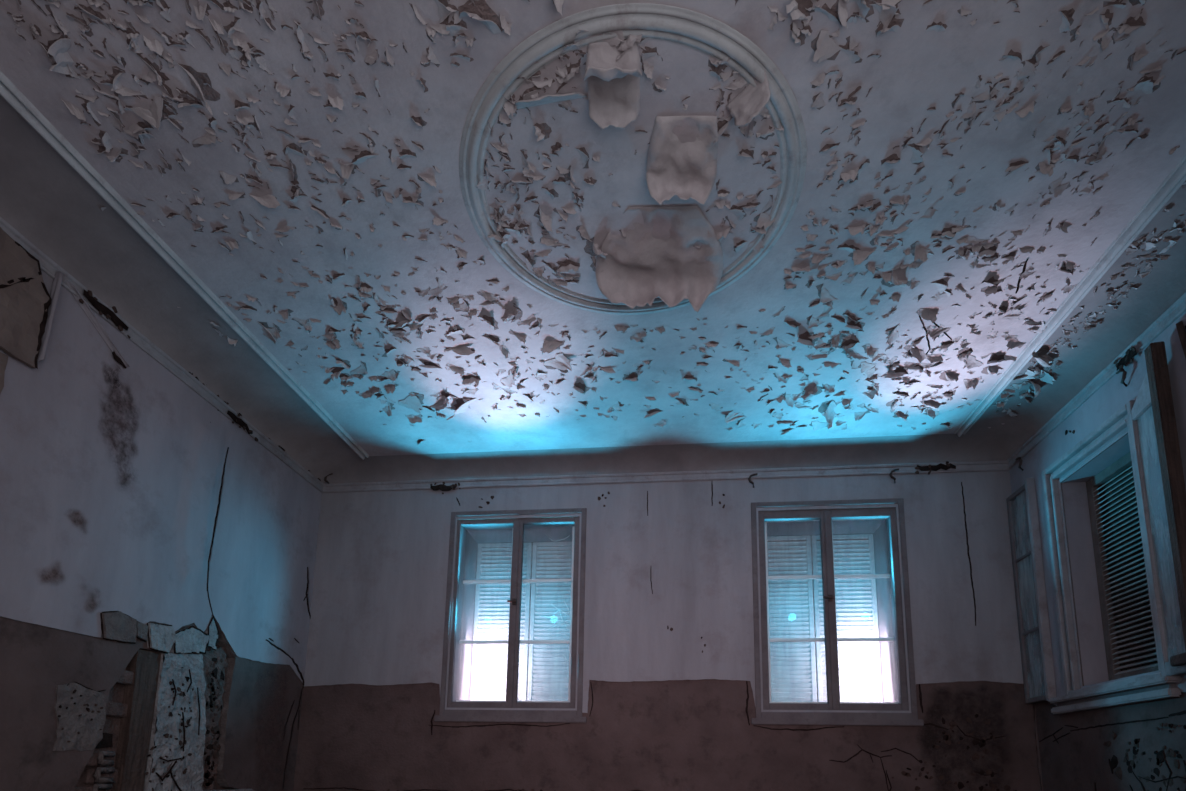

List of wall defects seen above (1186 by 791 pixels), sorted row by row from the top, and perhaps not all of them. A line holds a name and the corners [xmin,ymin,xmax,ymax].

peeling [0,0,1186,435]
damp [103,369,136,485]
spalling [58,689,113,749]
flaking render [144,653,254,791]